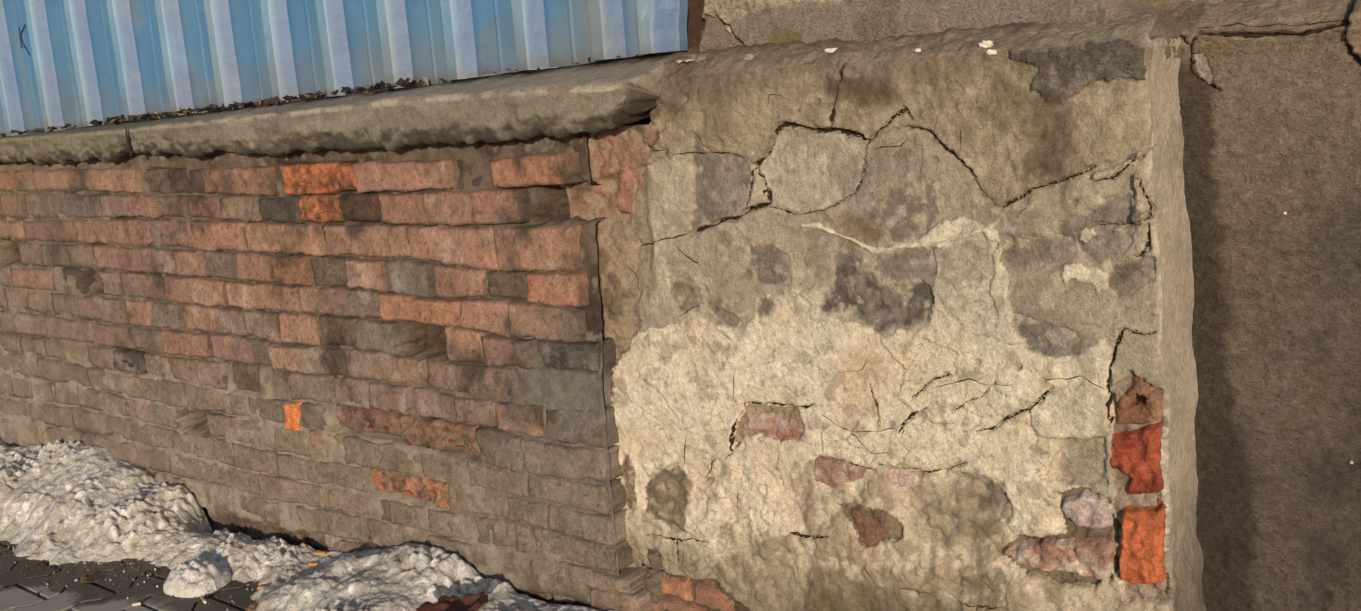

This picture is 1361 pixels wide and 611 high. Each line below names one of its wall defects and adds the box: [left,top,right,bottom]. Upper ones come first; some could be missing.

crack [1181,14,1361,89]
crack [625,63,973,329]
crack [1003,155,1153,257]
spalling [735,403,805,447]
spalling [814,456,904,548]
crack [641,328,1156,567]
spalling [945,370,1173,608]
spalling [653,572,750,611]
crack [863,564,1006,610]